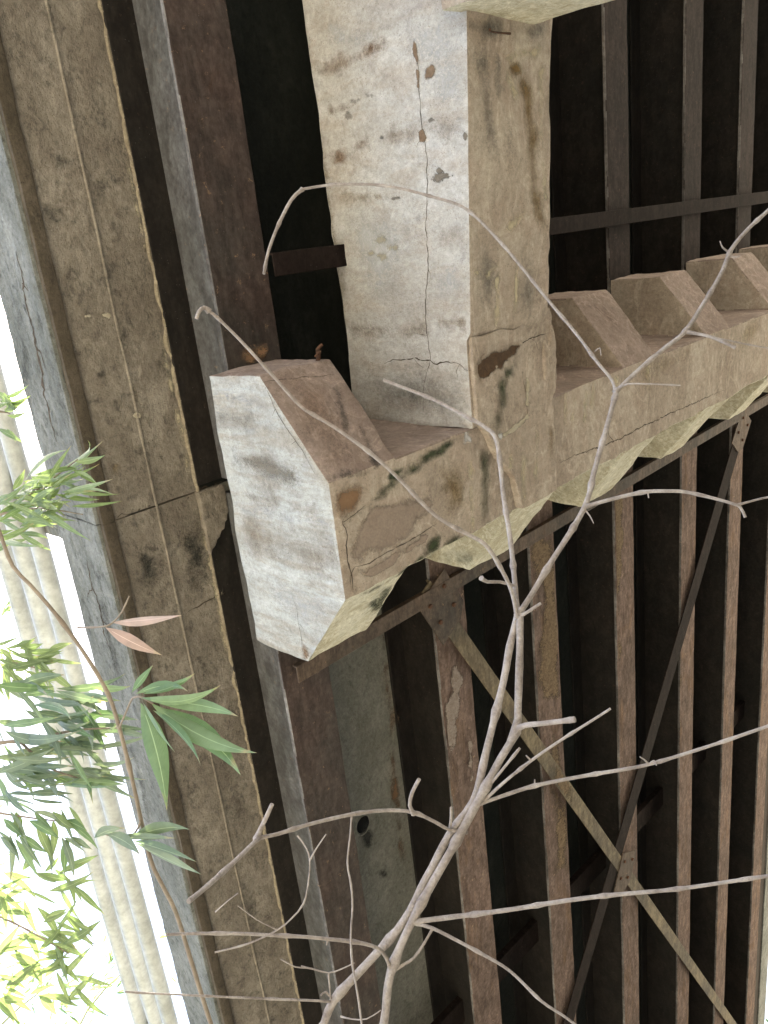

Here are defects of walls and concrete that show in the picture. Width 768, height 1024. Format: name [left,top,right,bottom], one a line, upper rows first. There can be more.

crack [386,67,471,412]
rust [337,488,362,514]
crack [342,506,434,588]
peeling [445,666,474,782]